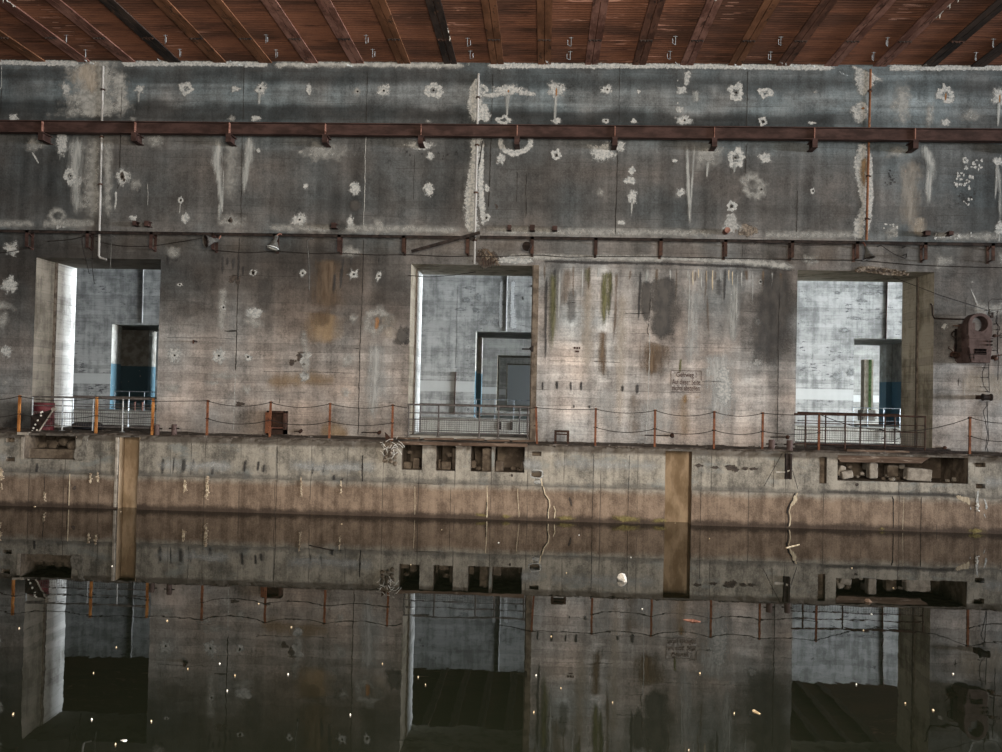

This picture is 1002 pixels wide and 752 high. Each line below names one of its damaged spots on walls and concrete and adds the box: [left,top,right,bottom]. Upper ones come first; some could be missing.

water stain [212,140,240,226]
water stain [922,147,935,202]
water stain [935,157,1002,241]
water stain [498,254,792,375]
water stain [706,354,735,423]
crack [541,478,556,519]
crack [773,460,798,526]